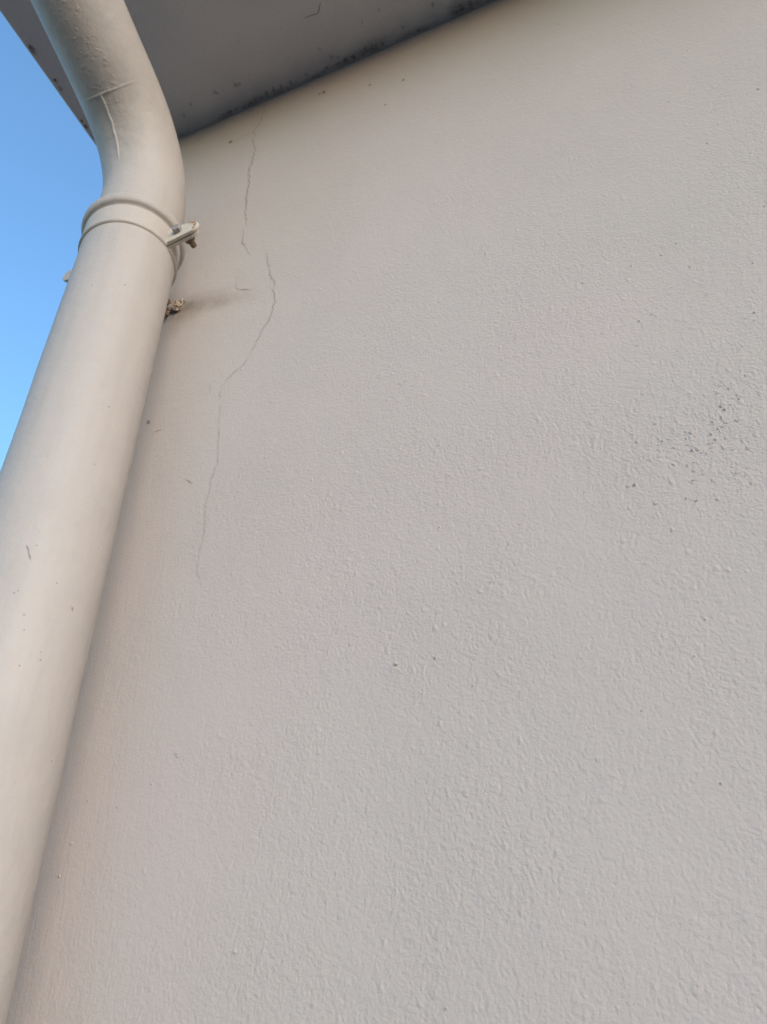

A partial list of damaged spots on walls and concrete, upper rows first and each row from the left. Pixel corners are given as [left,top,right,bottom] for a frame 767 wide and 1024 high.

crack [196,99,276,583]